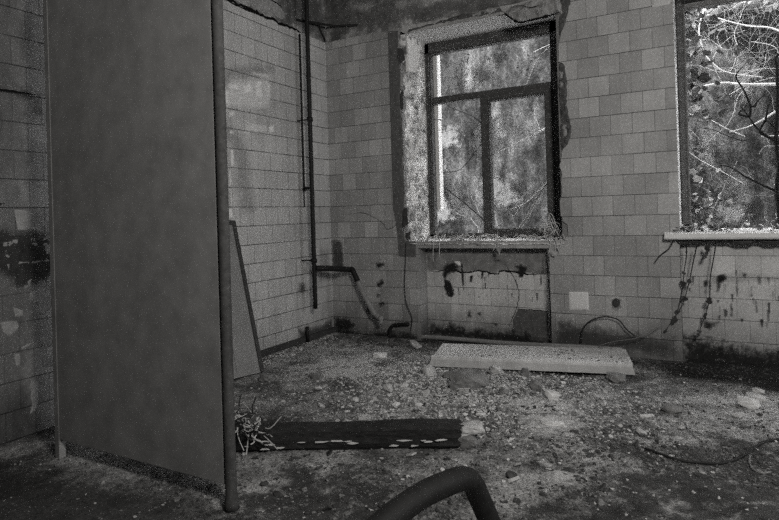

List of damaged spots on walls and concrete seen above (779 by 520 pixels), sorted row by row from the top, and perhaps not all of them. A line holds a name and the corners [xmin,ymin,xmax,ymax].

flaking render [234,0,285,20]
spalling [388,8,503,257]
peeling [426,248,547,290]
water stain [430,322,542,343]
peeling [512,309,549,343]
water stain [683,322,779,367]